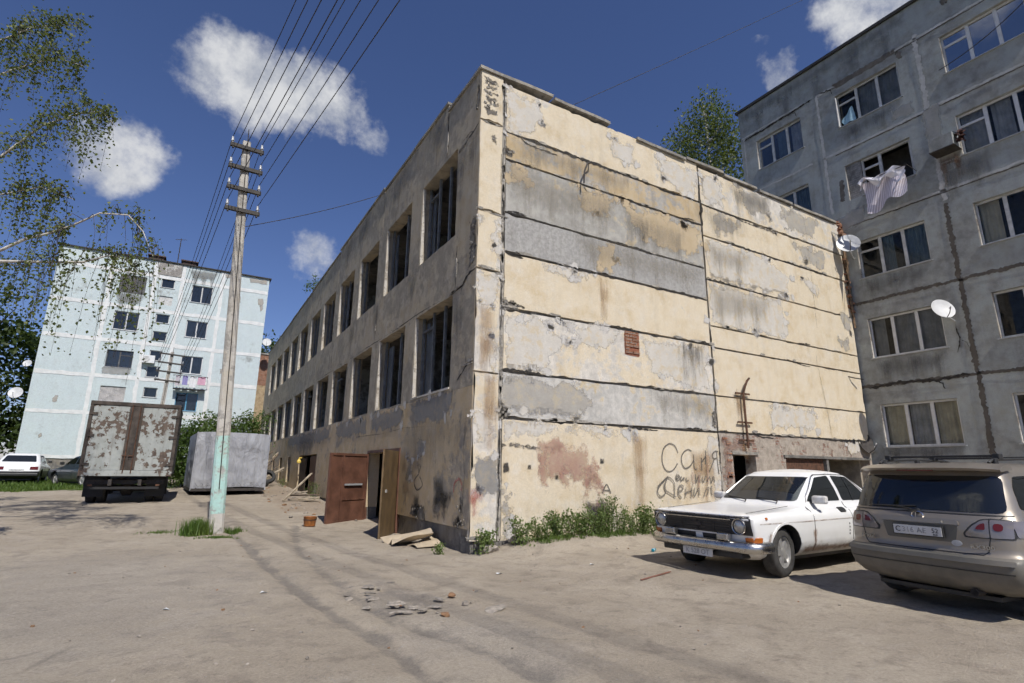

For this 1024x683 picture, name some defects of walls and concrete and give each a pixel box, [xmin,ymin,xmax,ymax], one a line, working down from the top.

peeling [476,76,547,189]
peeling [577,151,825,340]
crack [321,86,970,543]
leakage [538,452,570,486]
peeling [467,214,719,540]
peeling [770,401,821,436]
peeling [845,440,861,454]